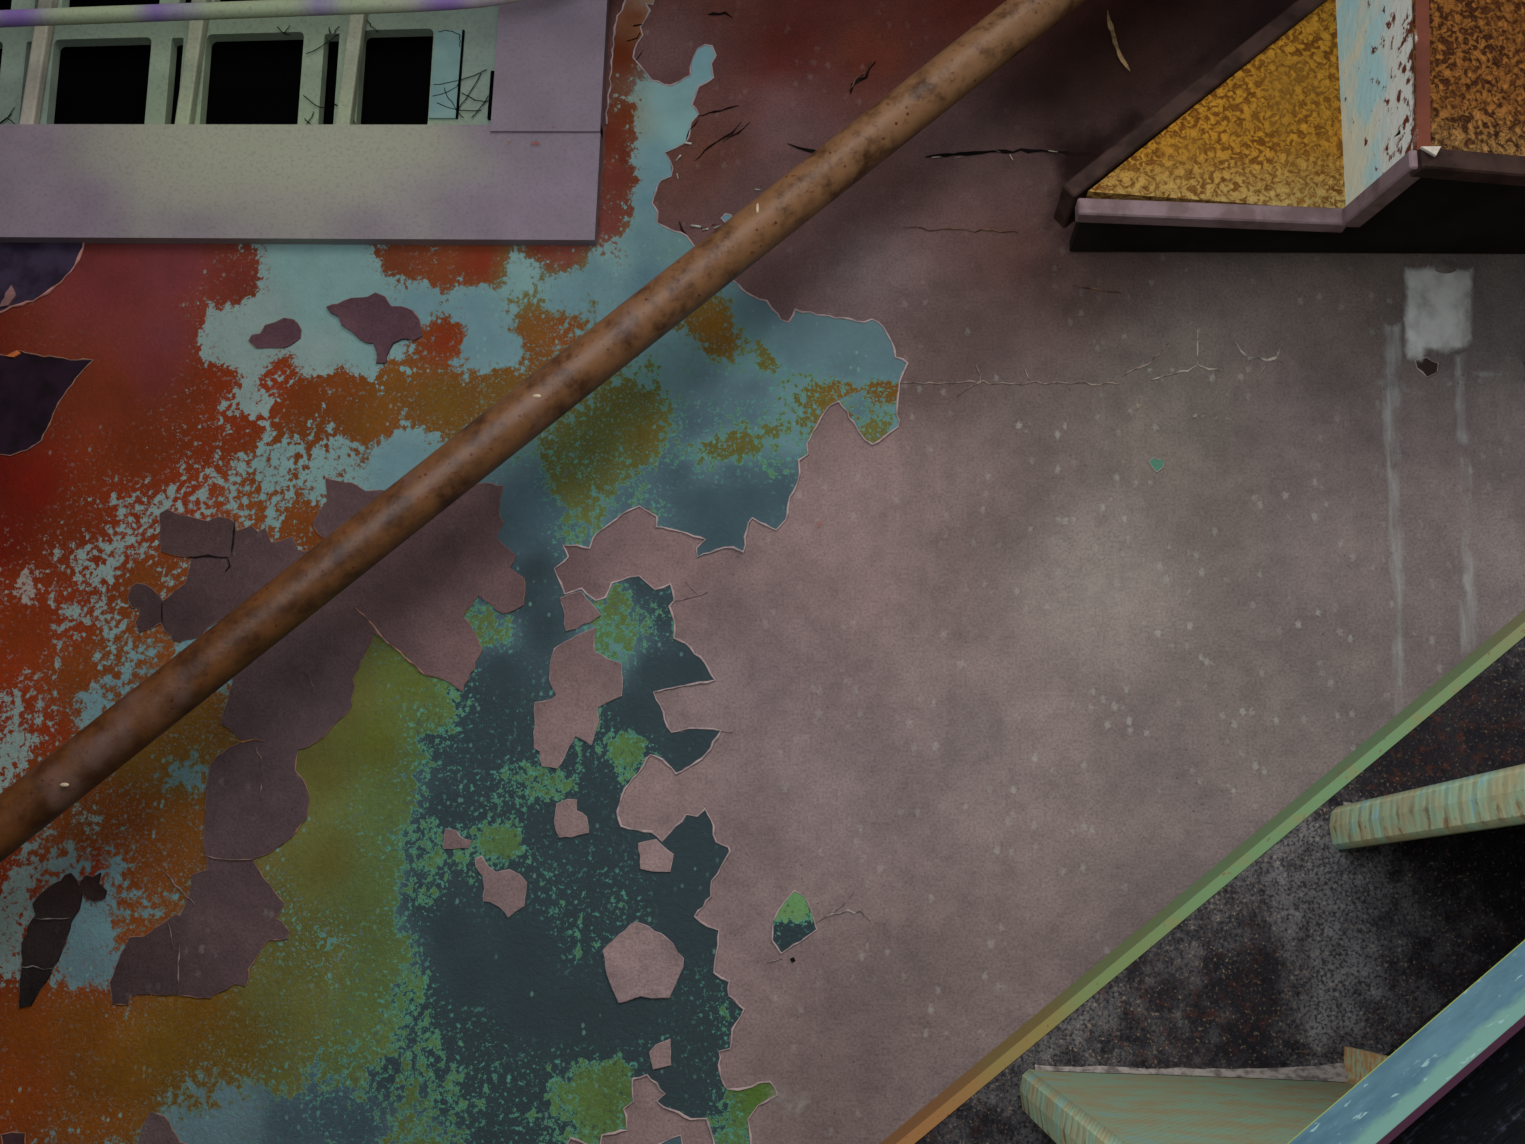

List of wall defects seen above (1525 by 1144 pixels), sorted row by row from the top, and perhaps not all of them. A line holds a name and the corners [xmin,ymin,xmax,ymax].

crack [708,10,732,18]
crack [850,62,876,93]
crack [686,105,750,161]
crack [787,143,816,153]
crack [925,148,1066,157]
crack [902,225,1017,233]
leakage [1393,268,1471,360]
peeling [0,0,717,794]
peeling [0,280,909,1144]